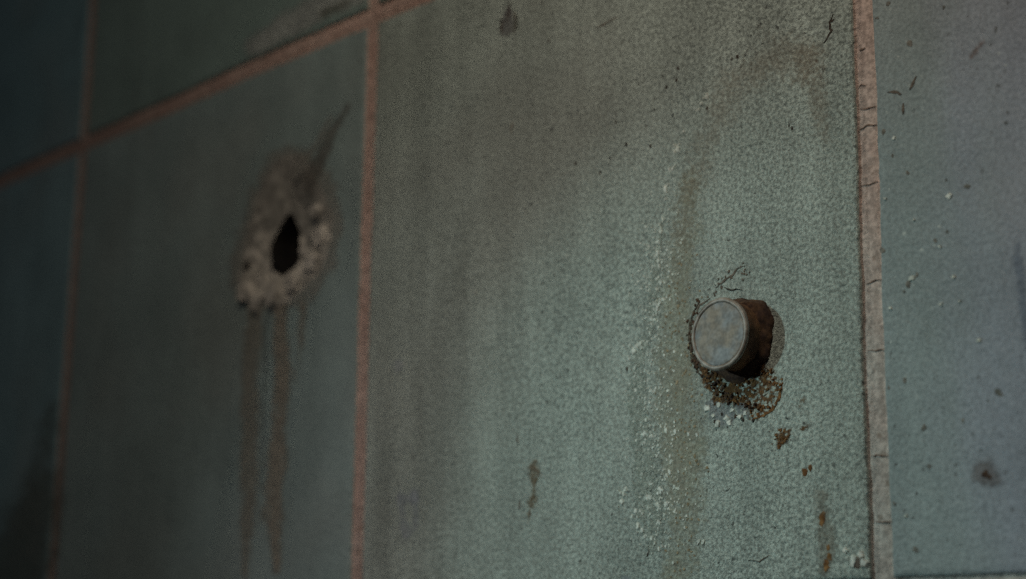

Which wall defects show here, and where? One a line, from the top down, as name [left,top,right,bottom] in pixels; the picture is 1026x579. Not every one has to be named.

crack [824,14,834,43]
hole [231,116,342,316]
rust [701,364,783,420]
rust [769,425,808,449]
rust [518,460,541,519]